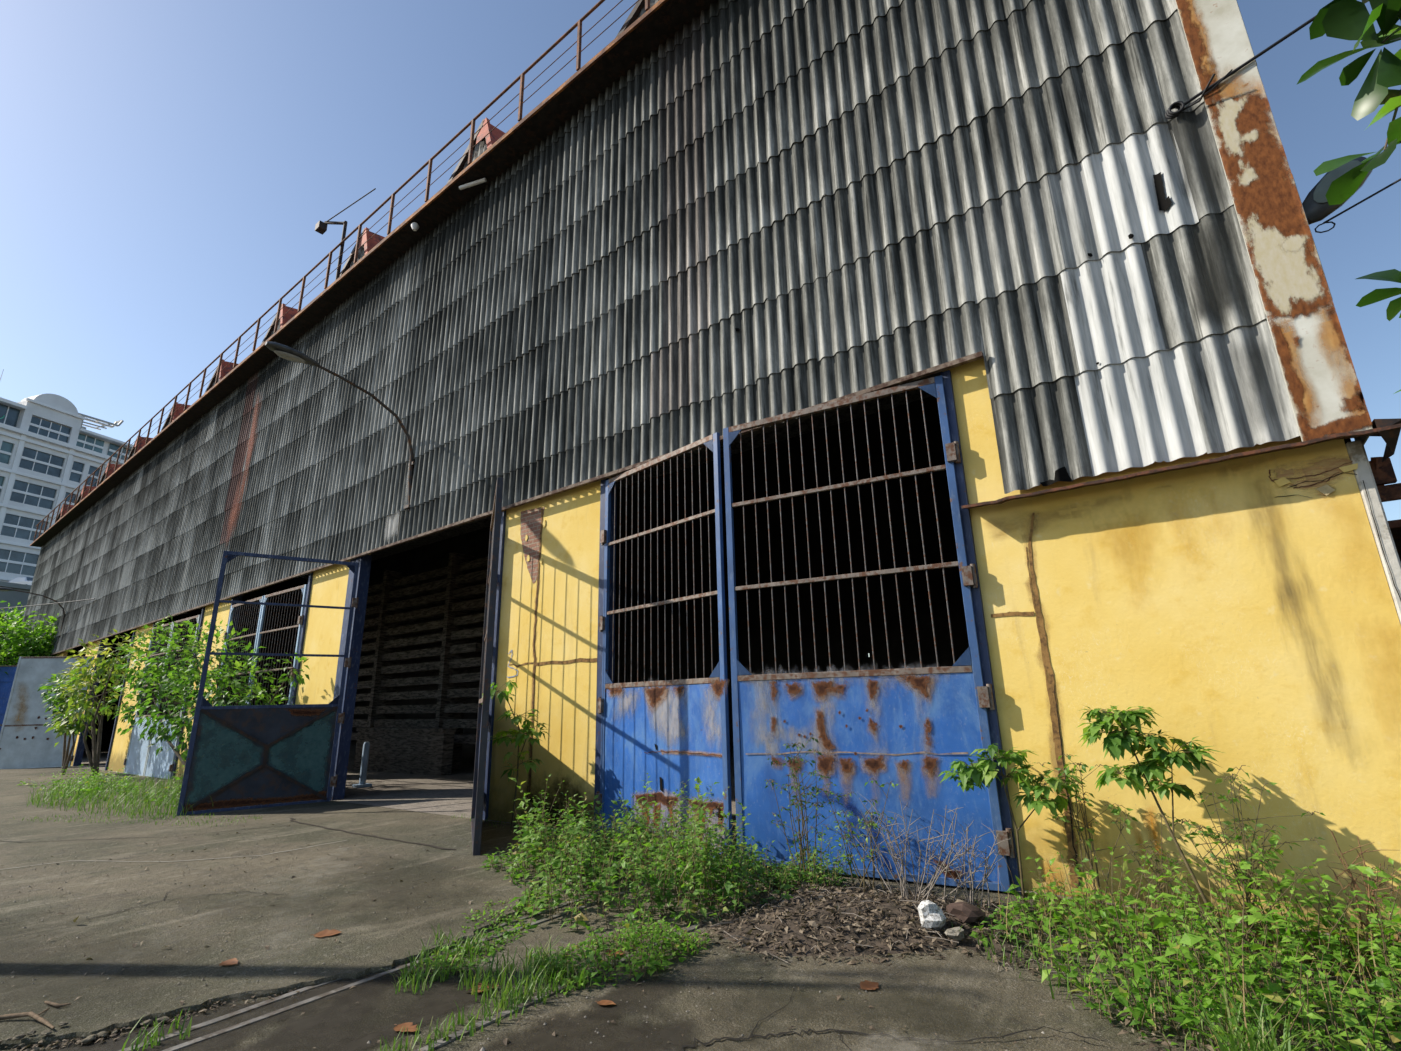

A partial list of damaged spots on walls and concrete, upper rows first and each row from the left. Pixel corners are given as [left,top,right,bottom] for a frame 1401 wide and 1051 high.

peeling [1217,98,1258,185]
peeling [1245,214,1323,314]
rust [231,412,256,523]
rust [644,686,684,711]
rust [710,680,725,700]
rust [746,679,968,802]
rust [897,675,934,698]